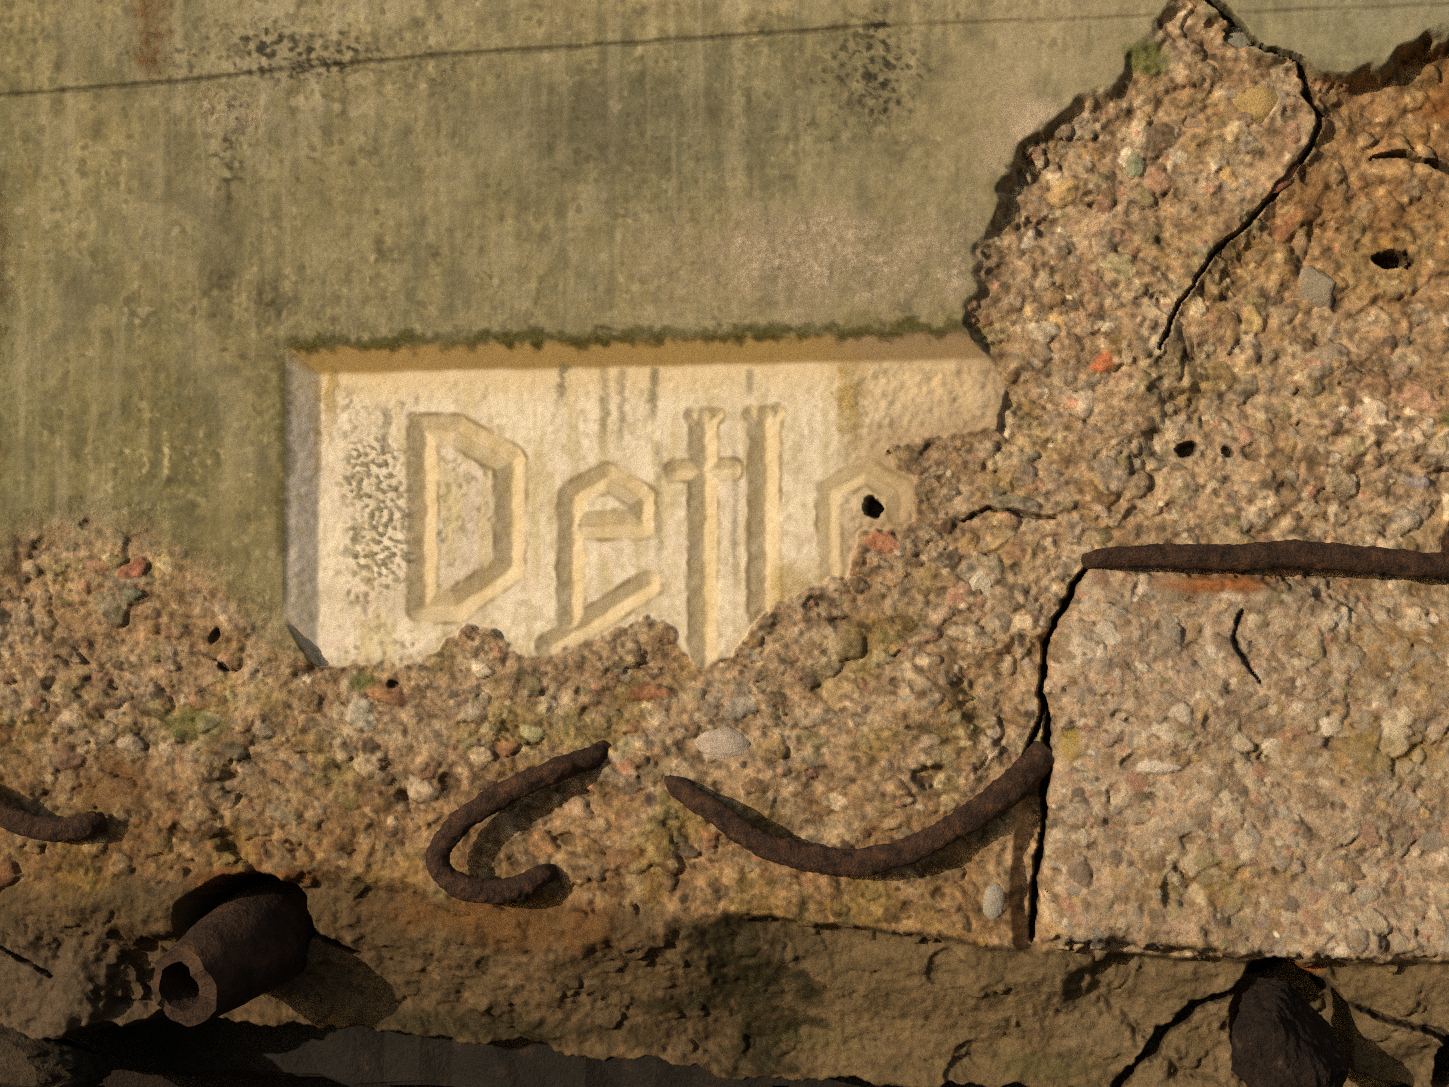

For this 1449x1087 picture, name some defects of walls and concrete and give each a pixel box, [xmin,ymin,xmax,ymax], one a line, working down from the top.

spalling [931,0,1449,616]
crack [1158,0,1327,351]
crack [1374,149,1449,174]
spalling [0,438,1267,1040]
spalling [218,740,1449,1087]
crack [1024,568,1088,941]
rust [1167,574,1262,592]
crack [1231,610,1262,683]
crack [1111,957,1449,1087]